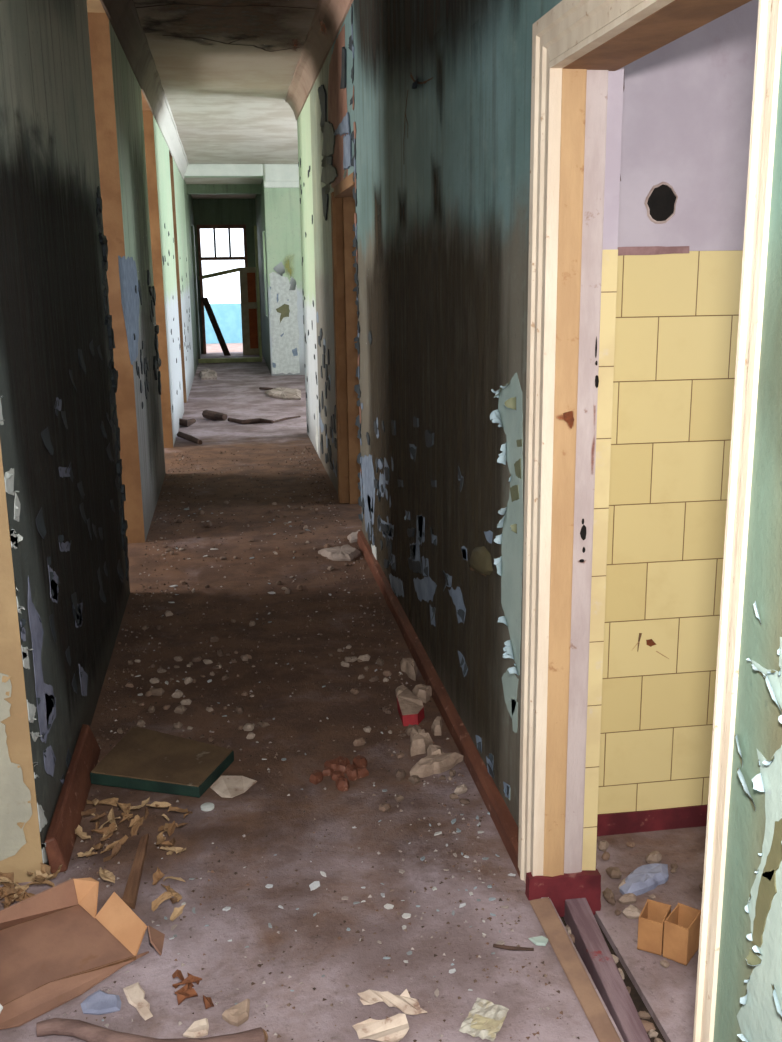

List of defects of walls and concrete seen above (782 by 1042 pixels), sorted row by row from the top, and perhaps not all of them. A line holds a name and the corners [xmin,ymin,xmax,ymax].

hole [644,181,678,224]
peeling [69,186,191,603]
spalling [269,261,338,478]
spalling [298,4,466,626]
peeling [4,468,23,549]
peeling [484,373,523,733]
spalling [0,507,71,863]
peeling [66,647,88,696]
peeling [458,651,468,677]
peeling [476,735,510,800]
peeling [746,637,782,724]
peeling [734,734,782,1042]